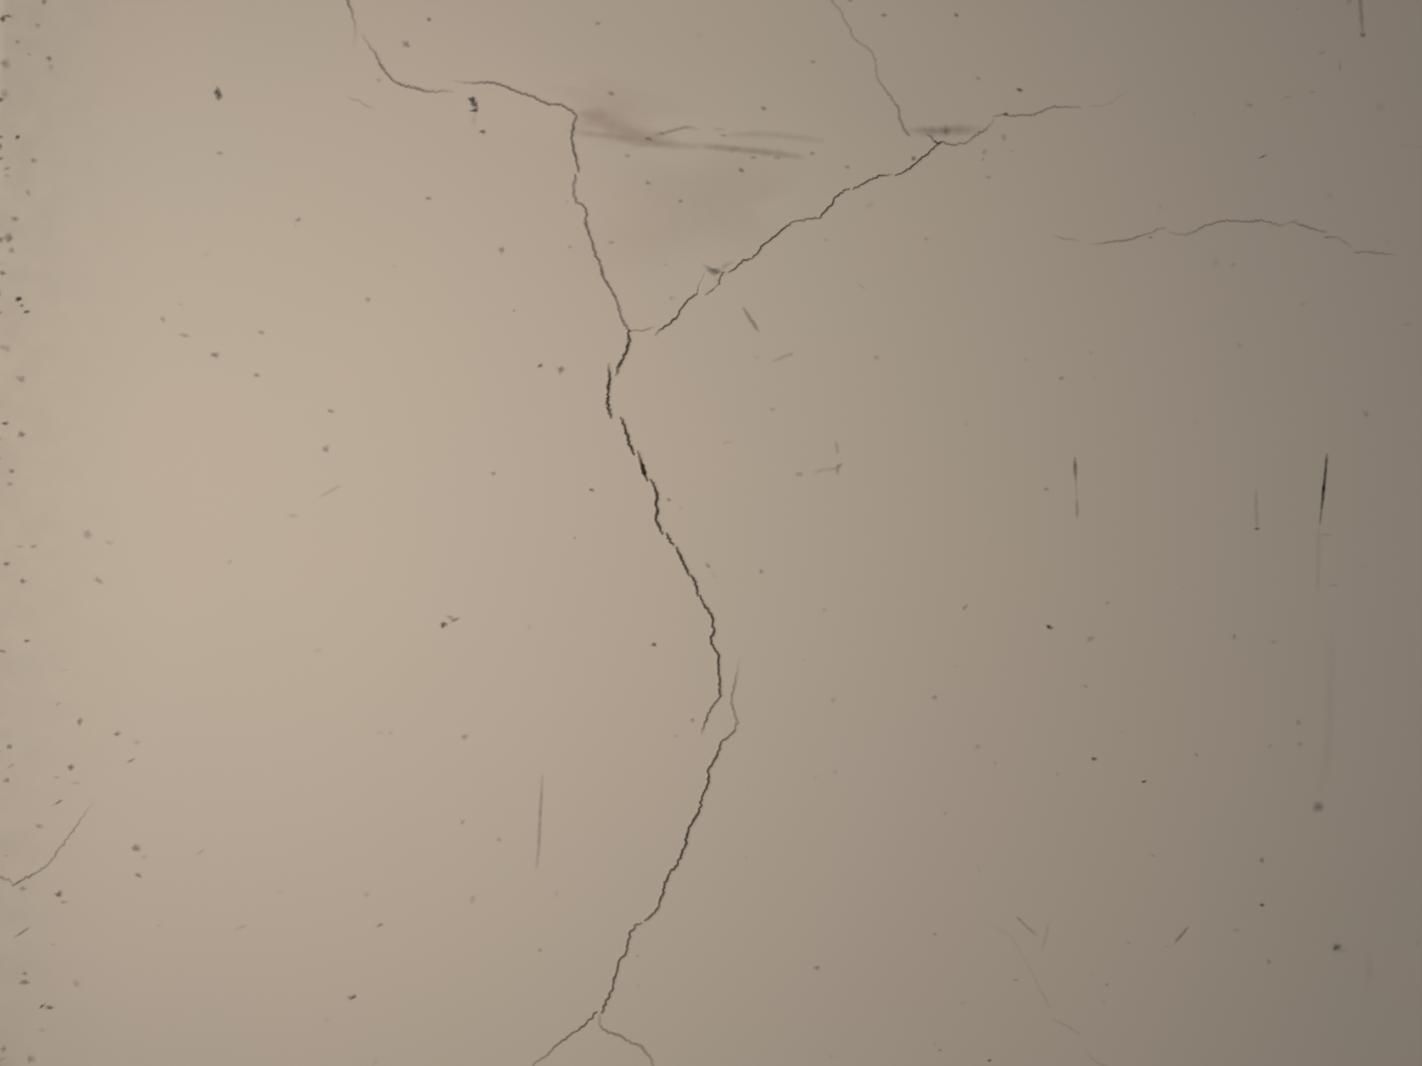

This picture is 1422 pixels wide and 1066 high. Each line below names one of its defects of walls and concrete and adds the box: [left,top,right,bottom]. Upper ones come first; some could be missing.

crack [344,0,1082,1066]